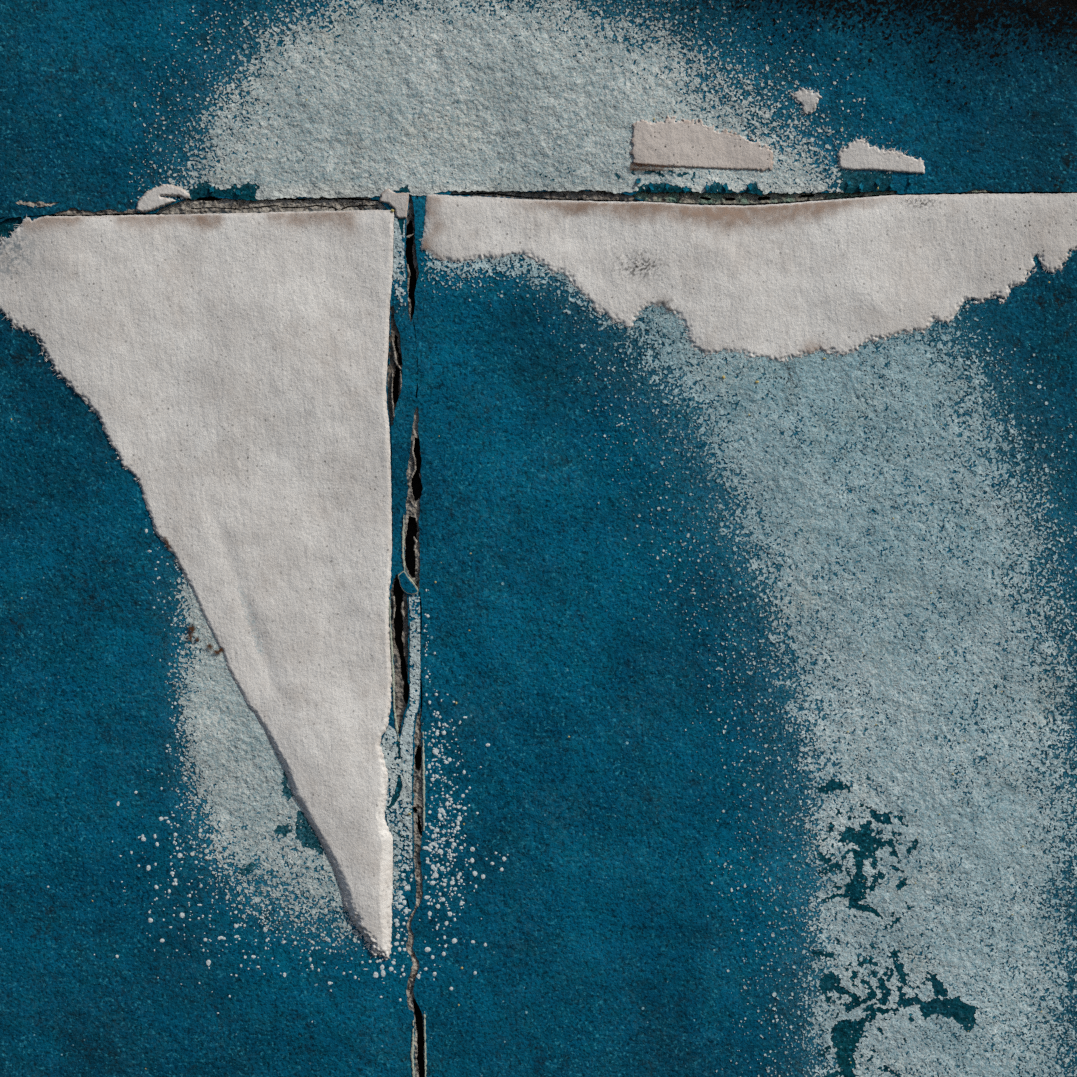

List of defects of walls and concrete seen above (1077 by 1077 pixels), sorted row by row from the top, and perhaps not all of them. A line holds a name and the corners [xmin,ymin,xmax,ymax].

peeling [0,180,410,962]
crack [2,186,427,1077]
peeling [421,114,1077,364]
crack [450,178,1077,206]